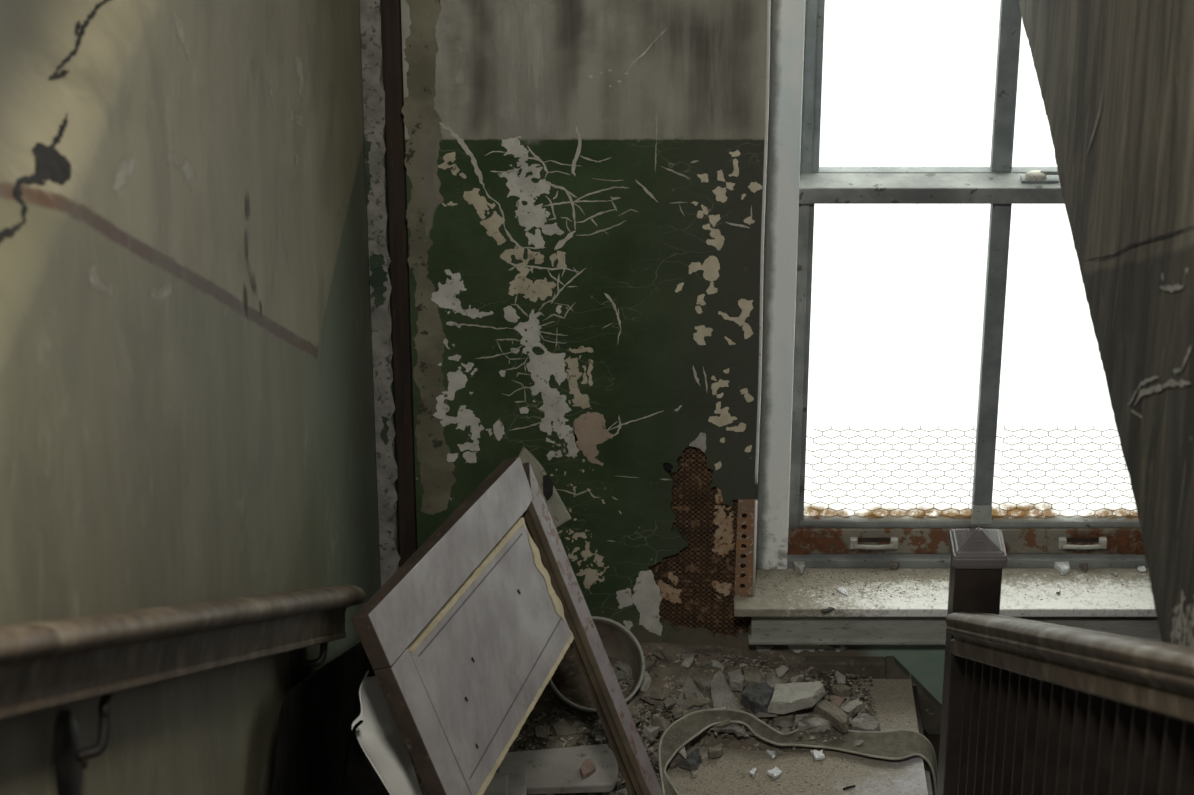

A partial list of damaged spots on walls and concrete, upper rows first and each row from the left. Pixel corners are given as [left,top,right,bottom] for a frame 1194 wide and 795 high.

crack [49,0,110,80]
crack [0,113,71,241]
peeling [675,150,763,345]
peeling [401,0,613,589]
flaking render [616,368,758,637]
corrosion [788,506,981,555]
corrosion [992,505,1057,518]
corrosion [1068,509,1145,555]
peeling [788,645,847,653]
peeling [1170,590,1194,647]